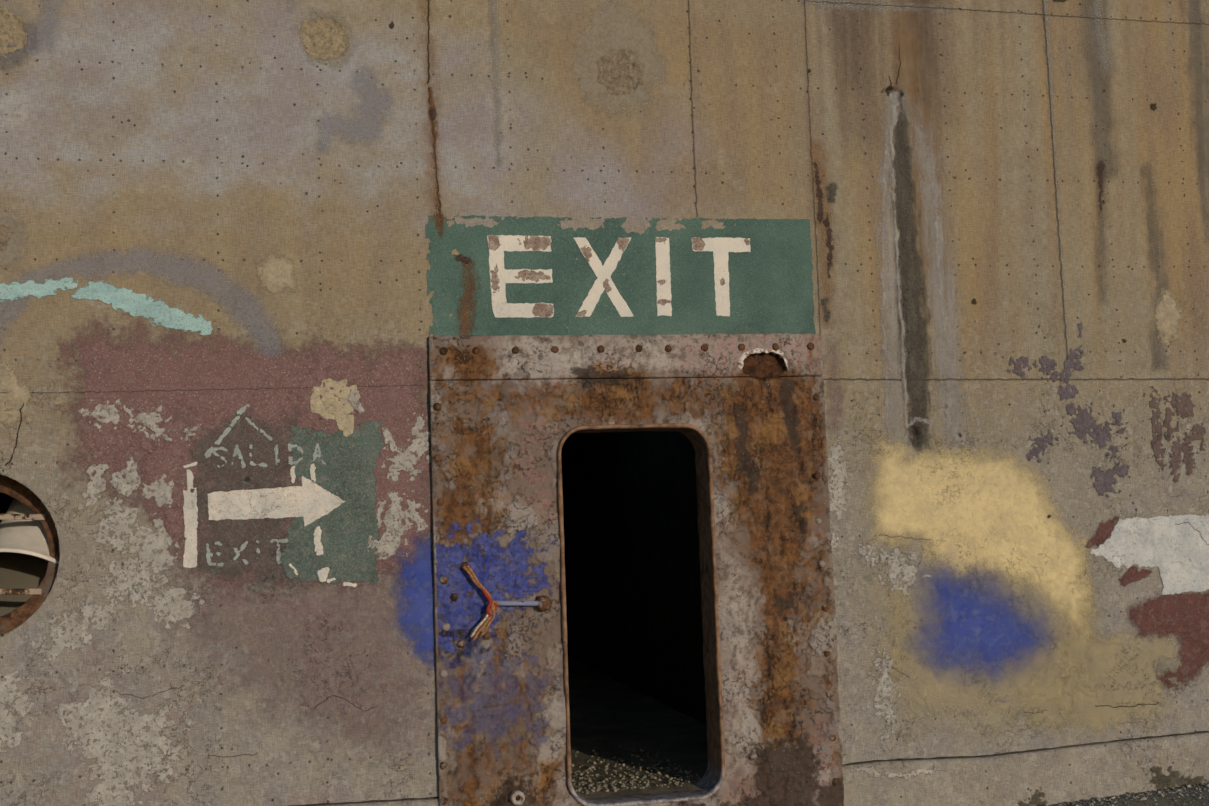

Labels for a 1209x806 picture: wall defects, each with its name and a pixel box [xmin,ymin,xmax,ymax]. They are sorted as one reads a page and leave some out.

rust [429,90,438,158]
crack [804,0,1209,381]
rust [451,249,475,335]
damp [879,86,966,452]
peeling [78,399,205,446]
spalling [310,378,364,437]
peeling [366,412,431,560]
peeling [1004,323,1130,497]
peeling [1143,386,1207,483]
peeling [31,457,212,665]
peeling [0,670,41,752]
peeling [56,668,193,806]